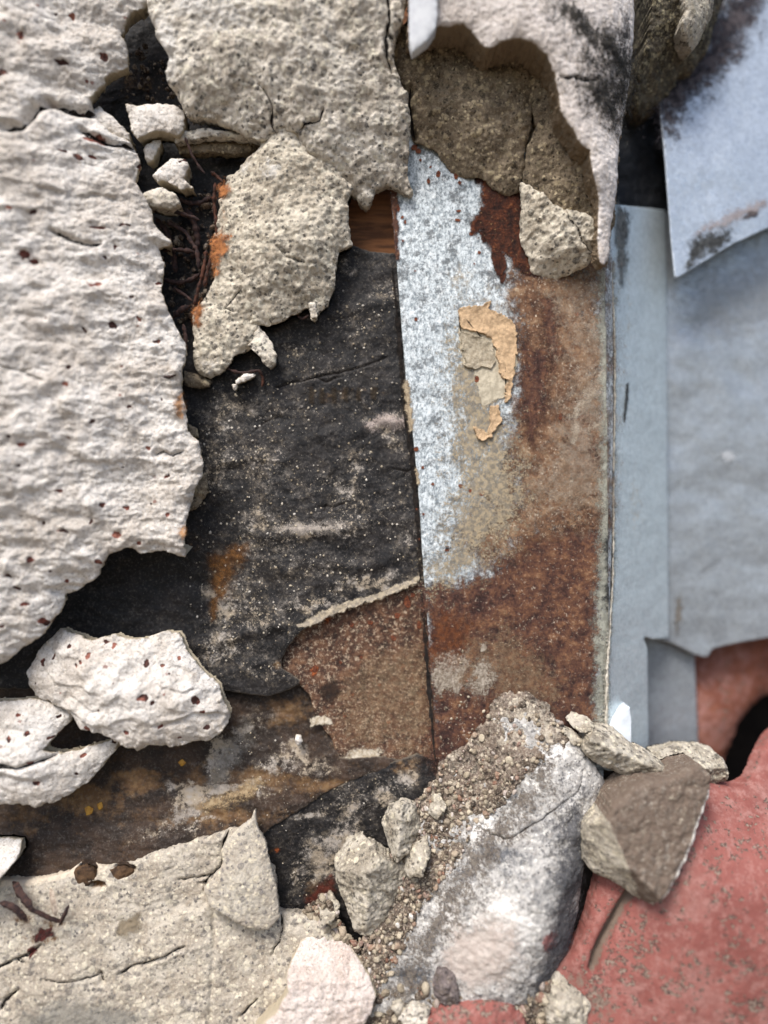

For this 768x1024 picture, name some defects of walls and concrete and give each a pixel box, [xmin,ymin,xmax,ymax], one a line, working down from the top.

crack [384,0,415,139]
damp [533,0,722,156]
crack [259,85,324,134]
rust [411,140,461,185]
rust [209,230,232,277]
rust [192,300,203,327]
peeling [458,301,518,441]
rust [281,178,625,776]
peeling [204,809,280,930]
crack [0,944,42,968]
crack [45,947,184,983]
crack [1,990,18,1009]